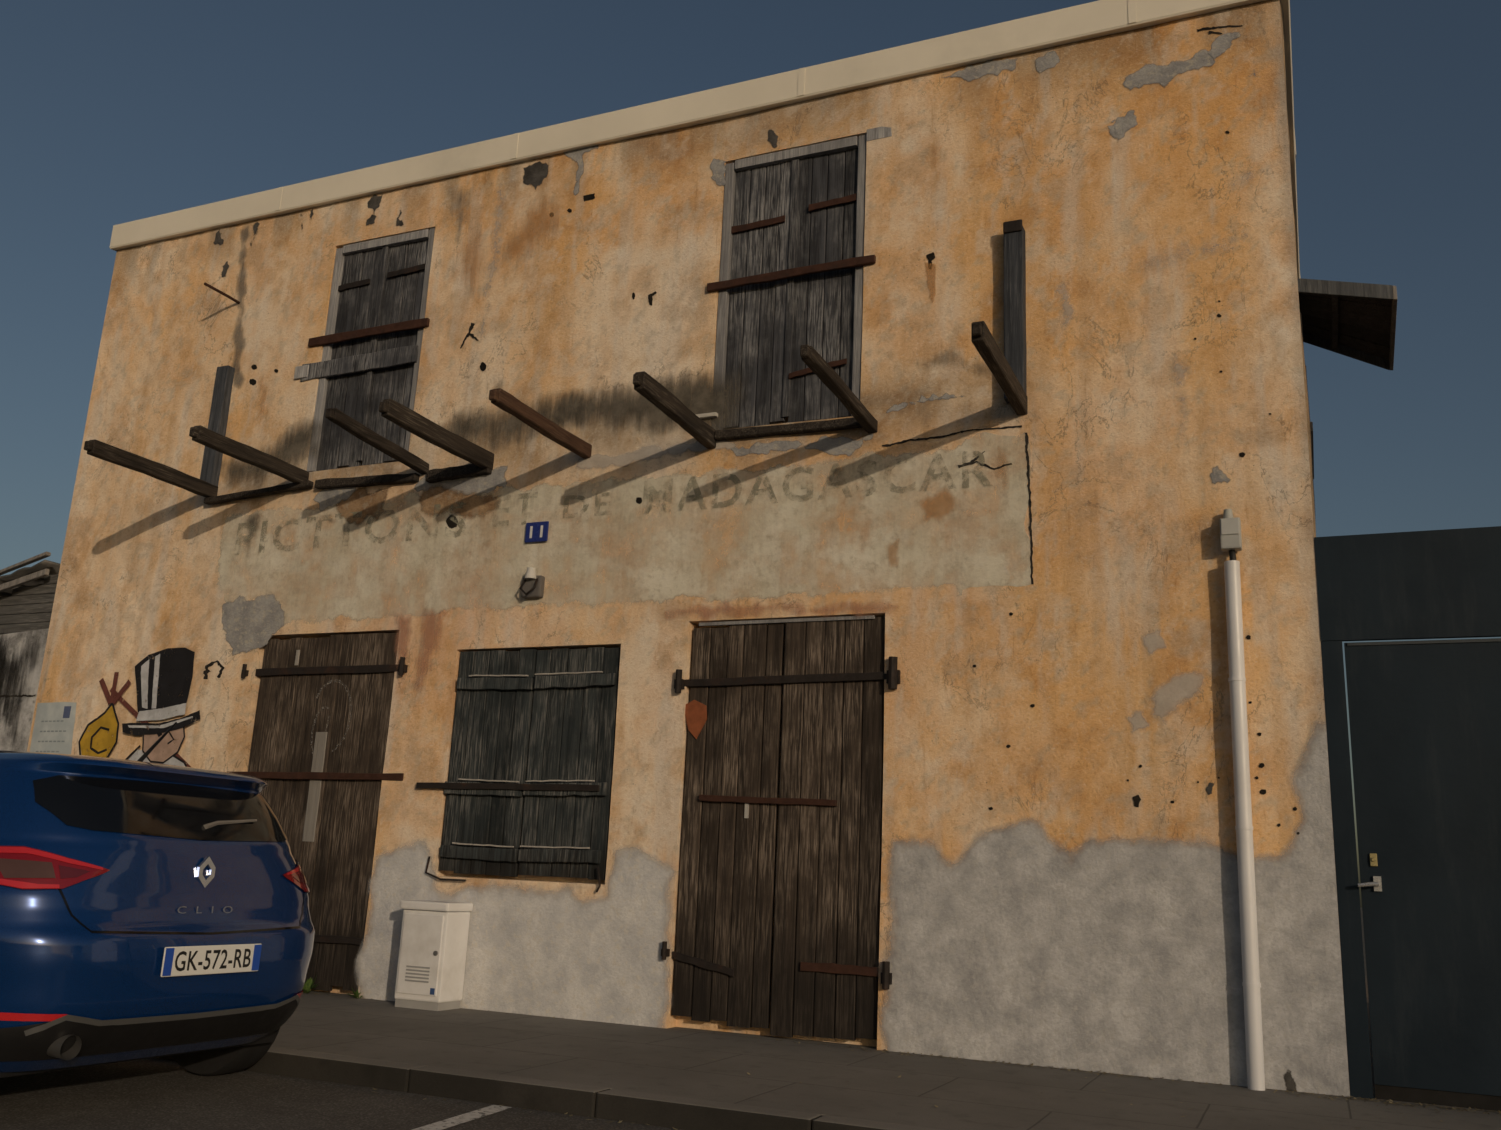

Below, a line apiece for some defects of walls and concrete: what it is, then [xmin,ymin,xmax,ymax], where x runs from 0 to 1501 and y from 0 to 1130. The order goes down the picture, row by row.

flaking render [943,59,1016,82]
flaking render [1123,32,1241,90]
flaking render [1108,110,1138,139]
damp [448,389,674,440]
damp [660,376,739,430]
flaking render [313,487,388,525]
flaking render [414,466,507,517]
flaking render [222,594,285,655]
damp [0,643,38,739]